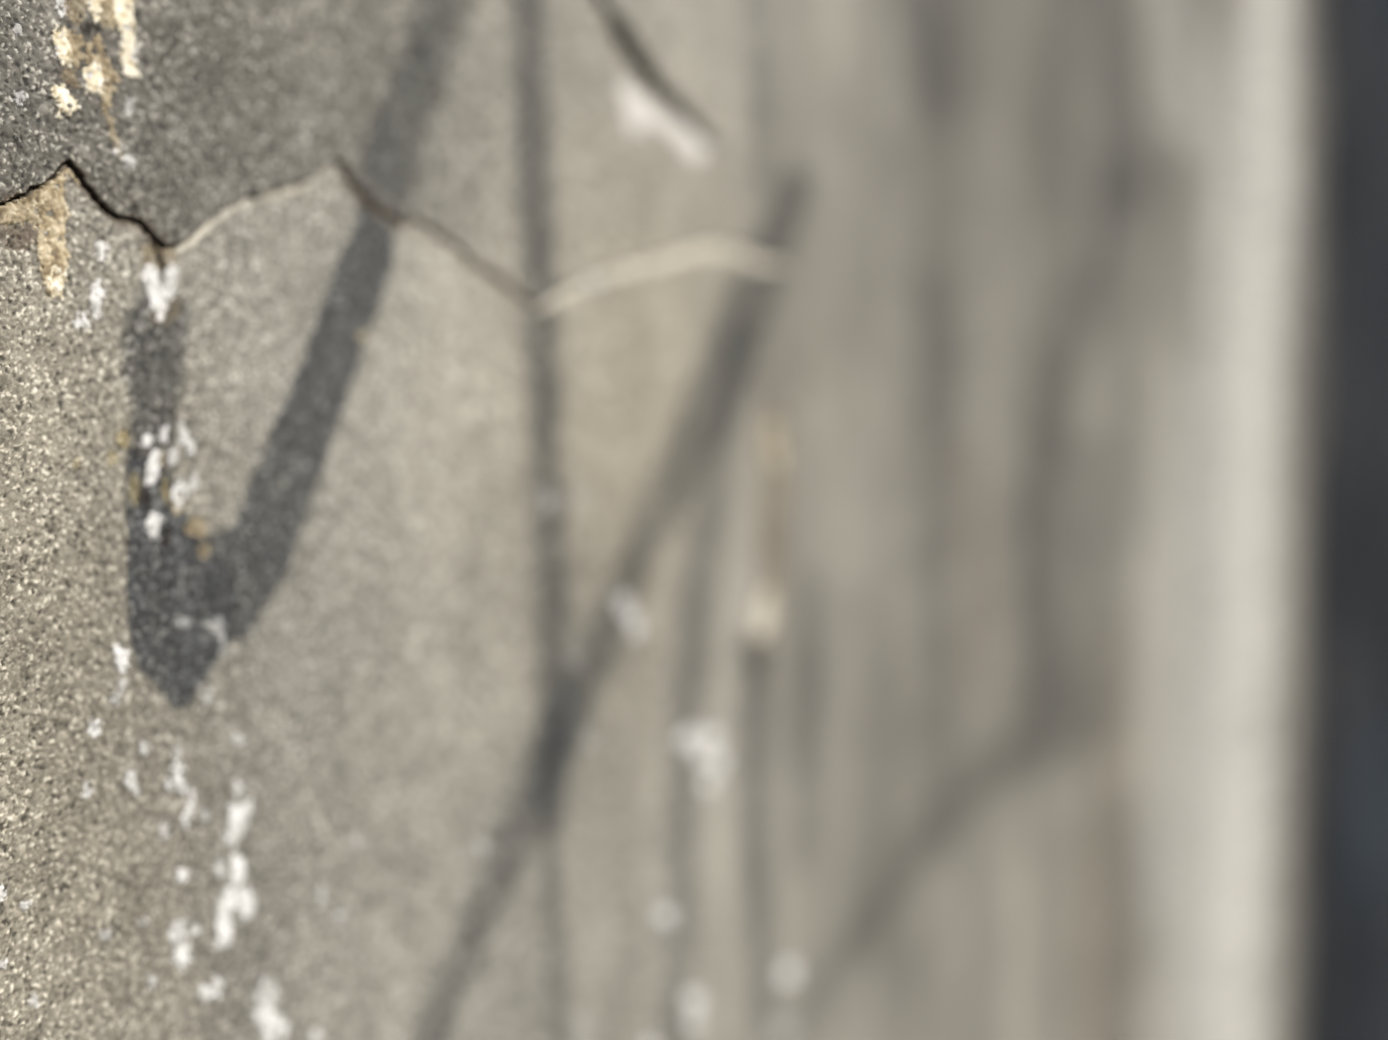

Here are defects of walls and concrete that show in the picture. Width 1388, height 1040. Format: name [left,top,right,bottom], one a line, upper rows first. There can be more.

peeling [50,0,141,170]
crack [595,0,710,143]
crack [0,158,787,312]